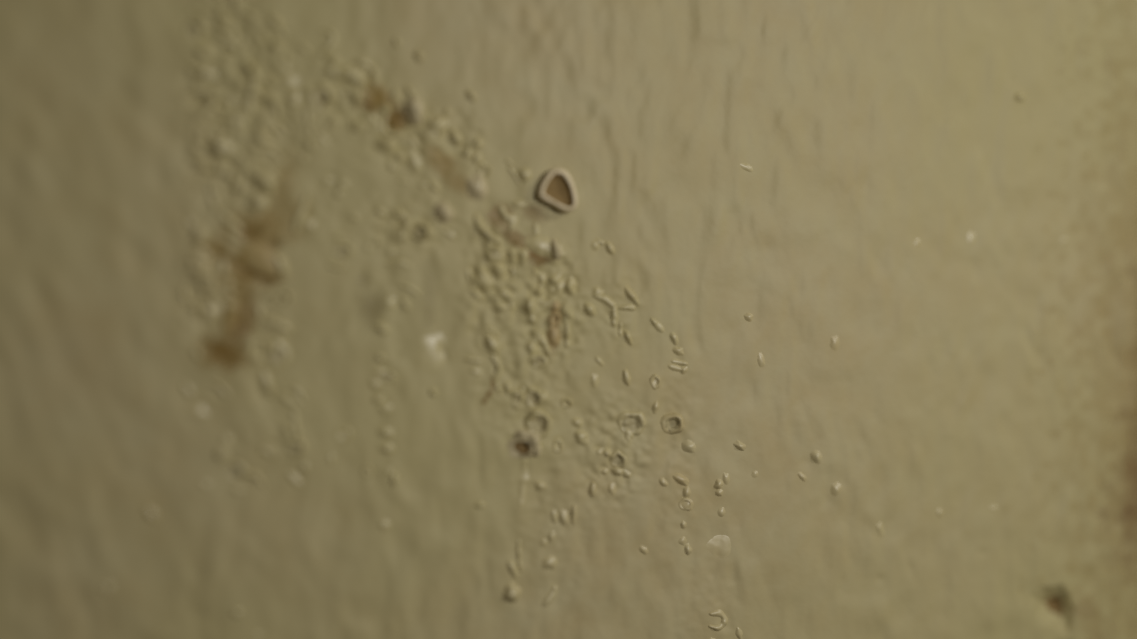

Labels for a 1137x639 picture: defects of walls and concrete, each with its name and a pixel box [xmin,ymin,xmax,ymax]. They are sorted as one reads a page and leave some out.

peeling [1027,583,1076,635]